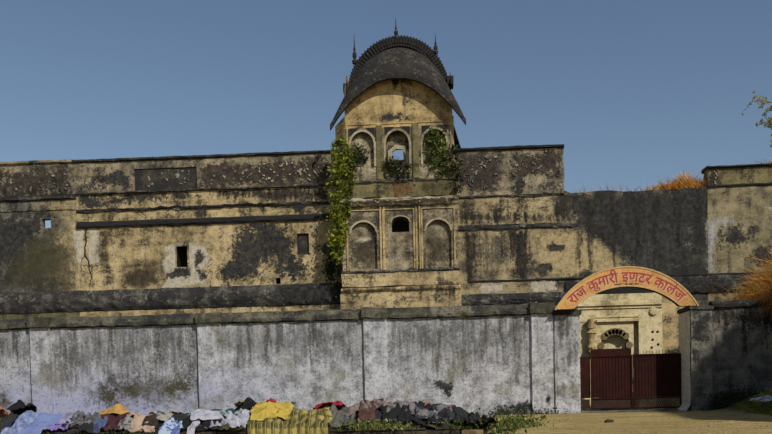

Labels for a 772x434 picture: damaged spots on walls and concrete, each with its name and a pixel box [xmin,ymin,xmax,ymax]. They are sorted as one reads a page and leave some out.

water stain [0,169,210,220]
water stain [217,187,328,213]
water stain [0,212,54,282]
water stain [121,265,158,288]
crack [72,202,318,287]
water stain [214,222,456,305]
water stain [459,177,772,292]
water stain [434,380,453,397]
water stain [489,400,532,415]